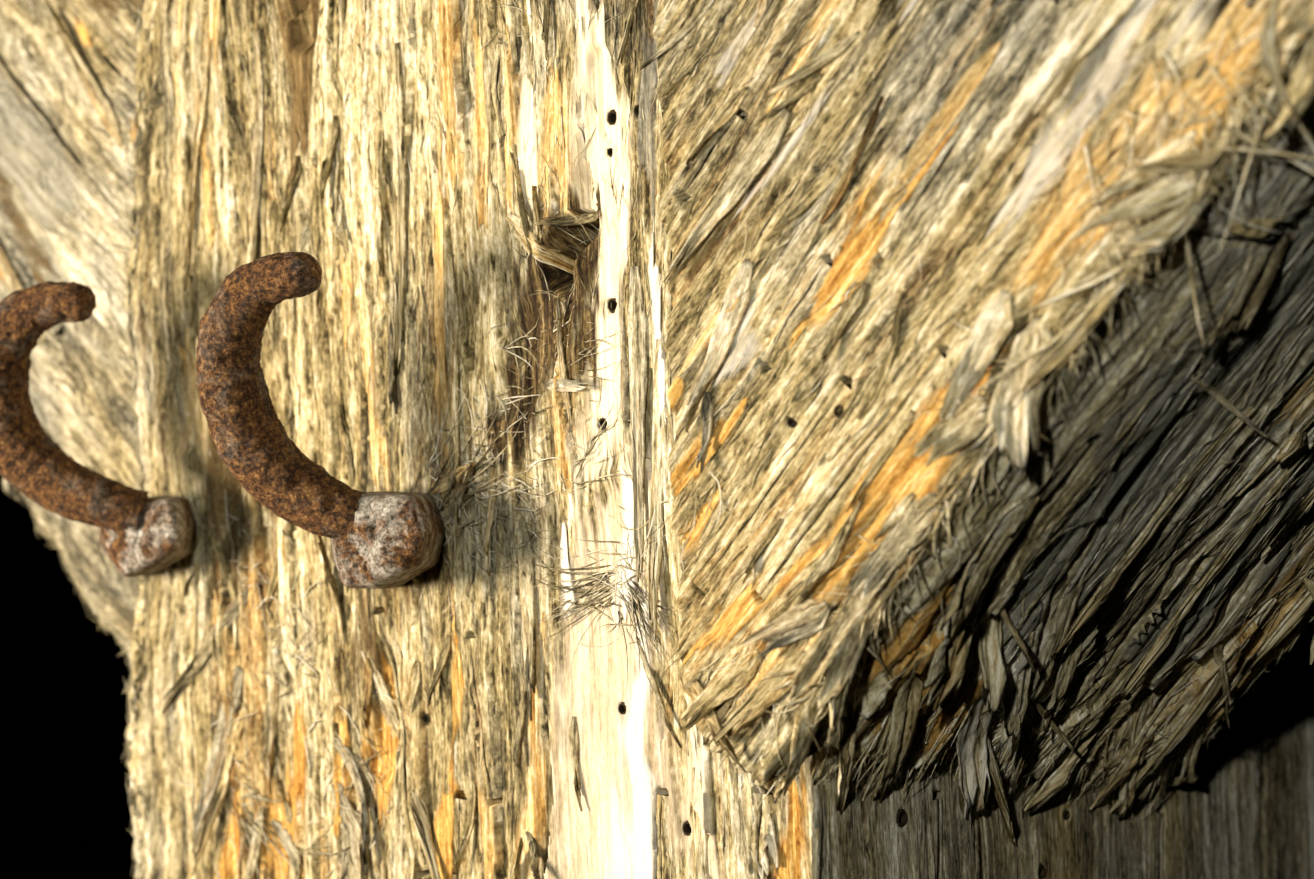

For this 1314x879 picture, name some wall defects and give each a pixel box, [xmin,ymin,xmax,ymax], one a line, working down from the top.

crack [0,45,132,236]